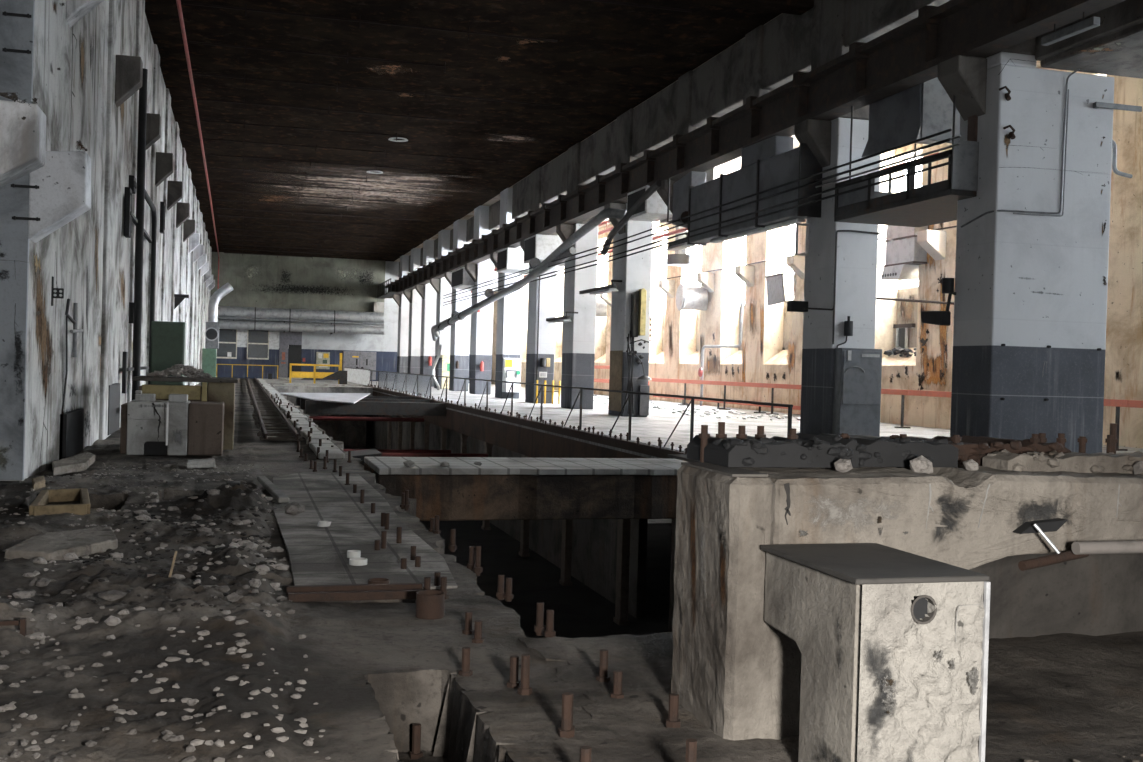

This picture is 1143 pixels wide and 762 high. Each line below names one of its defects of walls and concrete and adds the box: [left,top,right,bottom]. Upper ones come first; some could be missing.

rust [33,254,53,398]
rust [920,303,947,386]
damp [868,644,894,748]